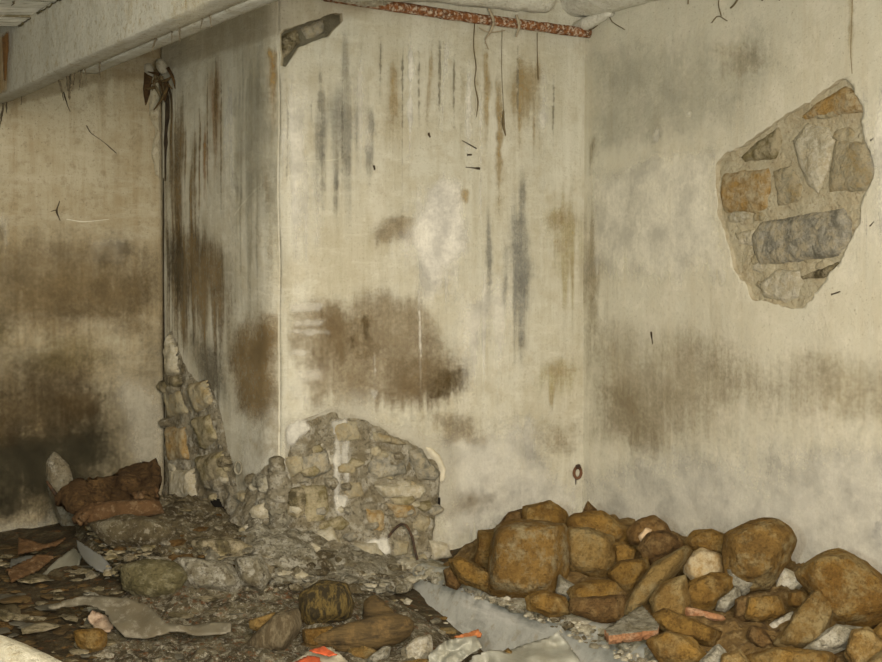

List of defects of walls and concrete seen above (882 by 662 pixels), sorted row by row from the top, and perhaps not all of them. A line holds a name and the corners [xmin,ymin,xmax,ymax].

spalling [281,14,340,67]
water stain [438,50,455,104]
water stain [466,55,503,172]
water stain [167,66,232,399]
water stain [381,180,468,295]
water stain [470,192,529,358]
spalling [719,80,874,309]
water stain [0,361,100,514]
spalling [156,331,452,586]
water stain [230,297,568,533]
water stain [369,538,390,555]
spalling [460,585,656,660]